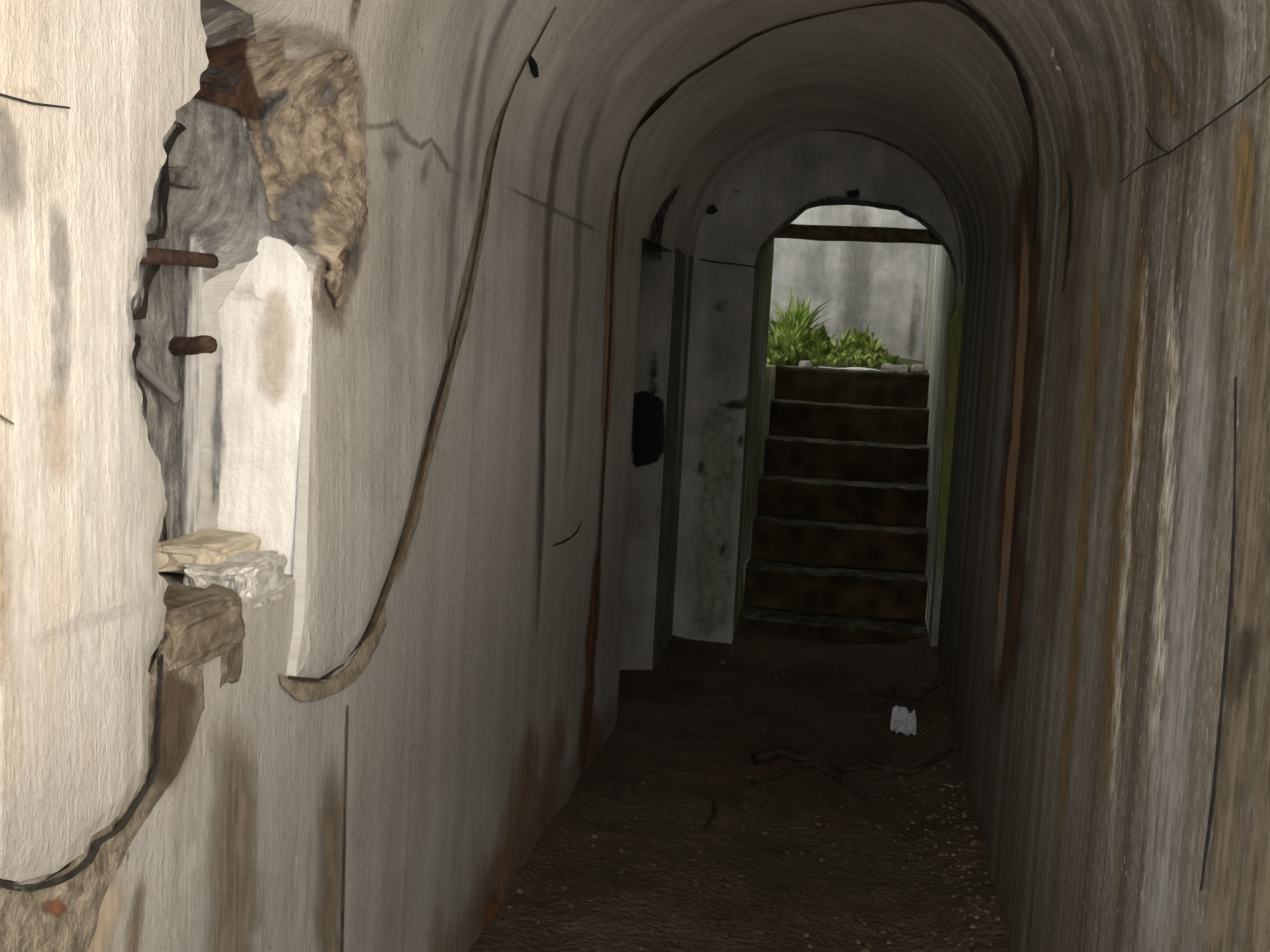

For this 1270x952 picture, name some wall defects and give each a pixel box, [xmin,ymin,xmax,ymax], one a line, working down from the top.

crack [0,93,70,109]
spalling [0,0,370,952]
crack [288,0,1037,781]
damp [1041,105,1111,644]
crack [1118,75,1270,184]
damp [1189,0,1225,477]
damp [1199,377,1270,952]